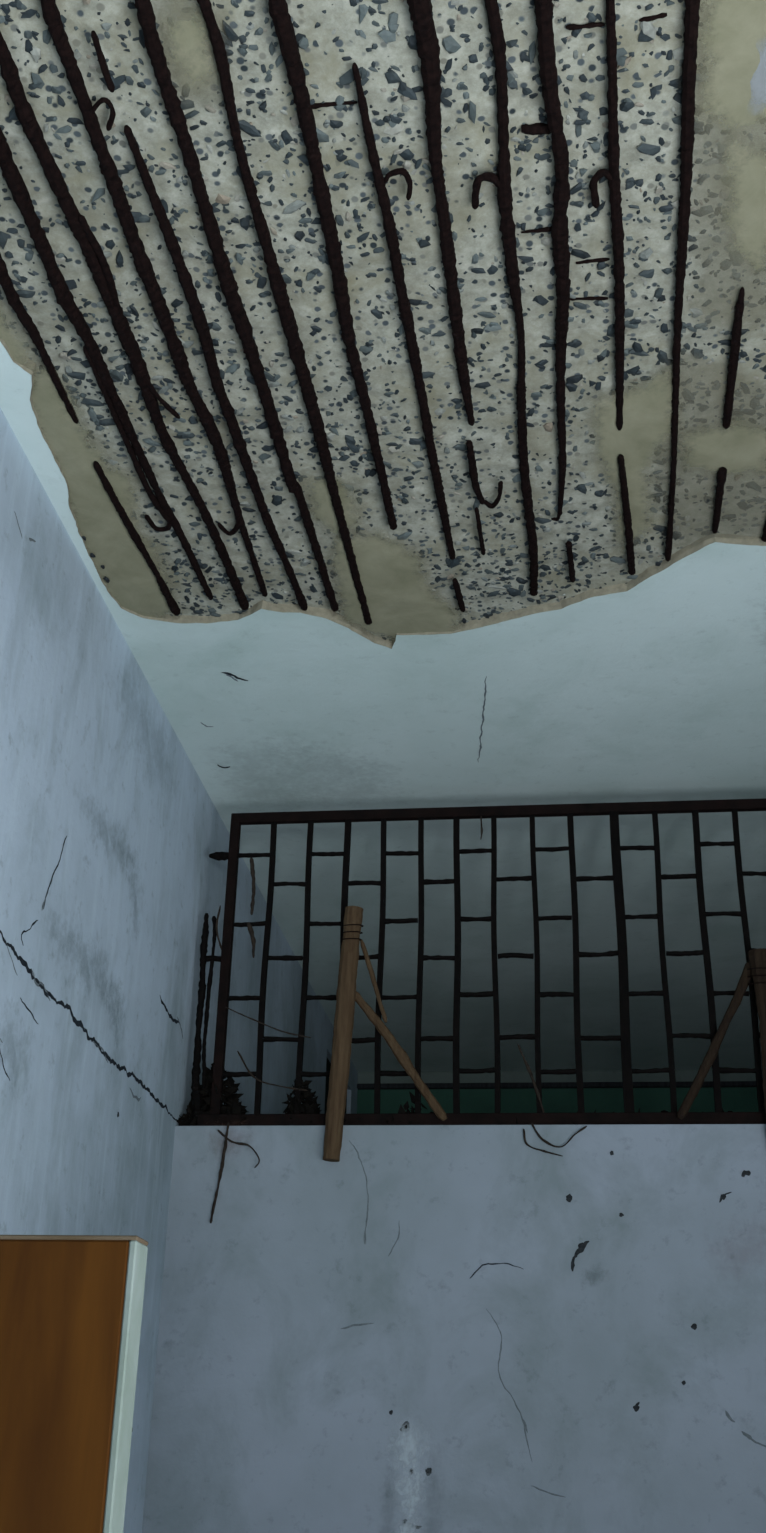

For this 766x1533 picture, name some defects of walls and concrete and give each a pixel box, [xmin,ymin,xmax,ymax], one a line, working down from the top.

spalling [0,0,766,649]
crack [0,836,177,1121]
crack [160,996,183,1038]